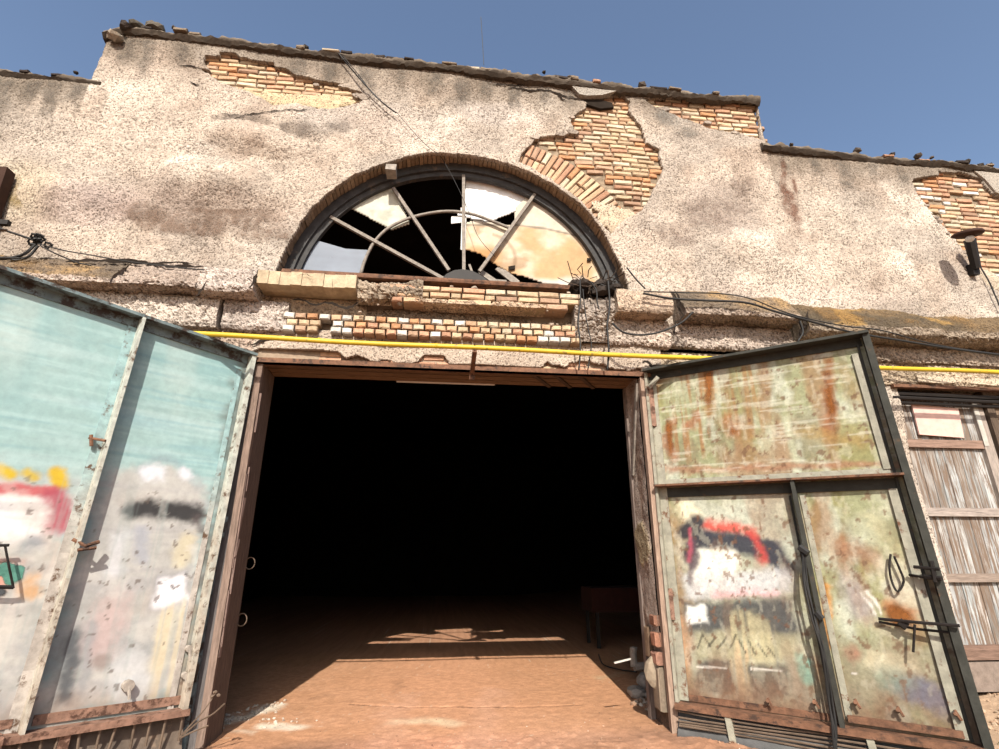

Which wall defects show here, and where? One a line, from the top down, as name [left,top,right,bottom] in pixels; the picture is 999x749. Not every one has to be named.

flaking render [206,55,370,109]
flaking render [647,99,768,143]
flaking render [519,86,662,233]
rust [781,165,798,217]
flaking render [912,171,999,291]
rust [704,371,713,404]
rust [826,387,835,415]